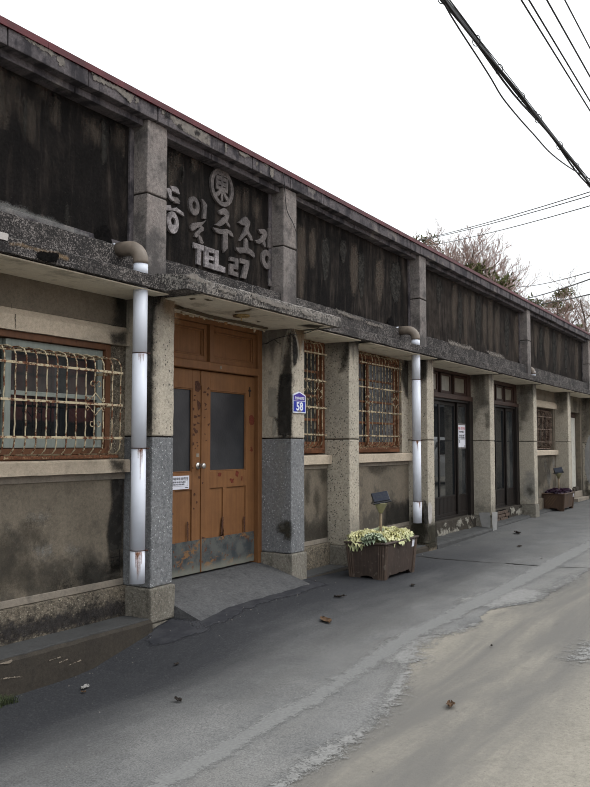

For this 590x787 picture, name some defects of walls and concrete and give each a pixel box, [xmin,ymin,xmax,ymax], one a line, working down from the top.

water stain [268,329,299,438]
water stain [63,479,124,589]
peeling [437,513,476,536]